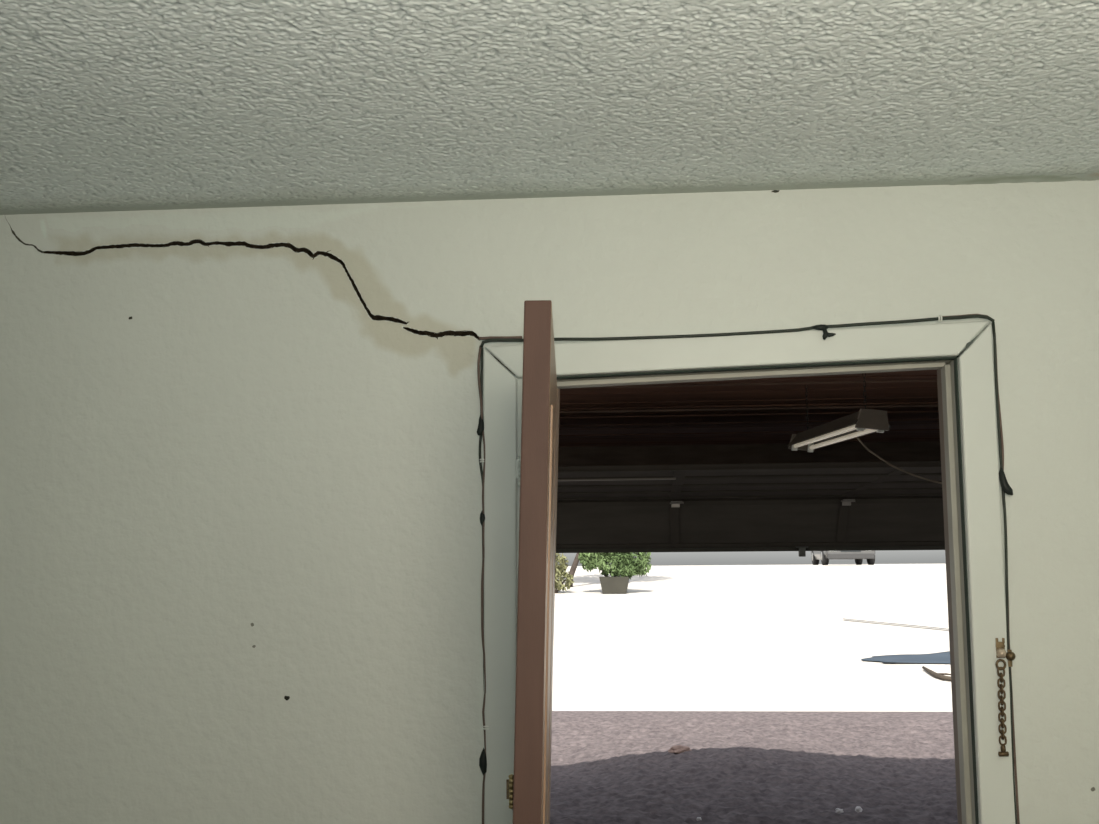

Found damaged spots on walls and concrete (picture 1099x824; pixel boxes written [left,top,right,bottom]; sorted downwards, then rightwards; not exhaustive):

crack [5,217,515,375]
damp [44,224,484,385]